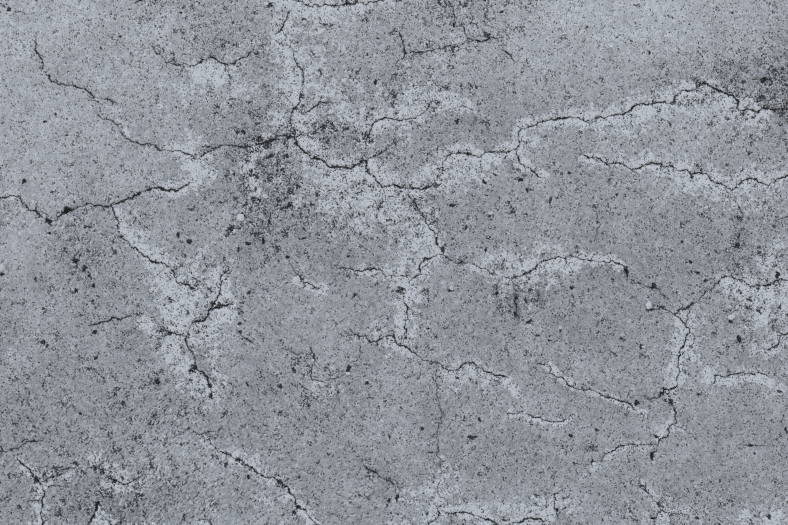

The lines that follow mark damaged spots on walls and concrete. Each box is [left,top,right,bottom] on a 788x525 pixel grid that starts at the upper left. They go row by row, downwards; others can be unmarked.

crack [35,36,116,105]
crack [0,181,196,291]
crack [88,0,788,463]
crack [0,439,140,525]
crack [192,430,317,525]
crack [428,398,559,525]
crack [638,478,706,525]